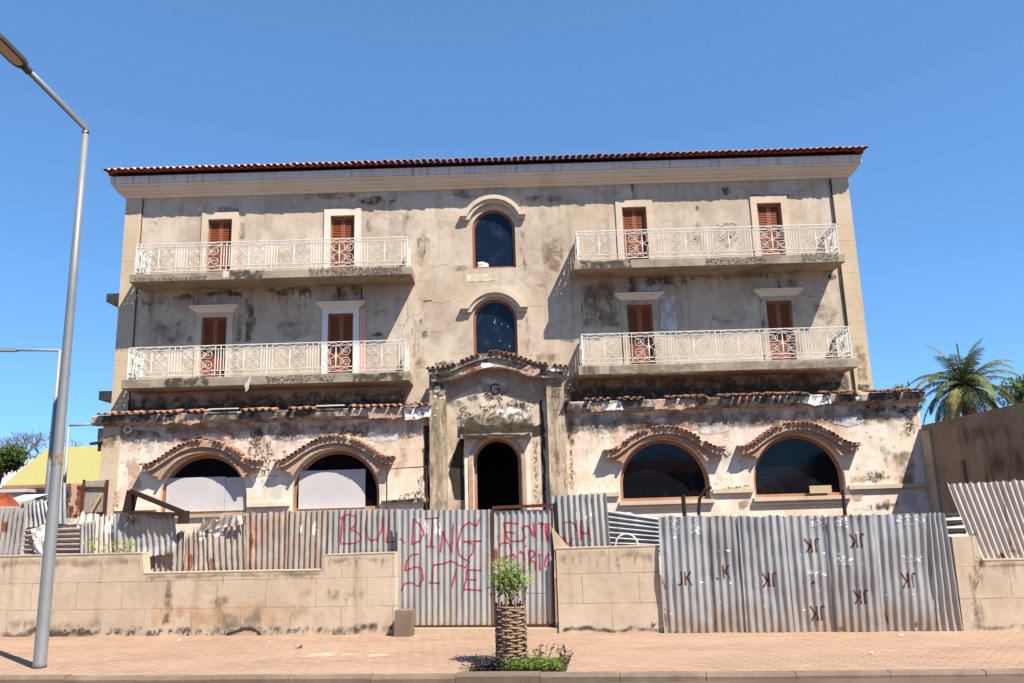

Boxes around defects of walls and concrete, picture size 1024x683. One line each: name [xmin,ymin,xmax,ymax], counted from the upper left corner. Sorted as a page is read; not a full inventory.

leakage [133,275,253,341]
leakage [579,259,635,326]
peeling [368,363,560,450]
leakage [449,346,922,510]
leakage [49,612,393,637]